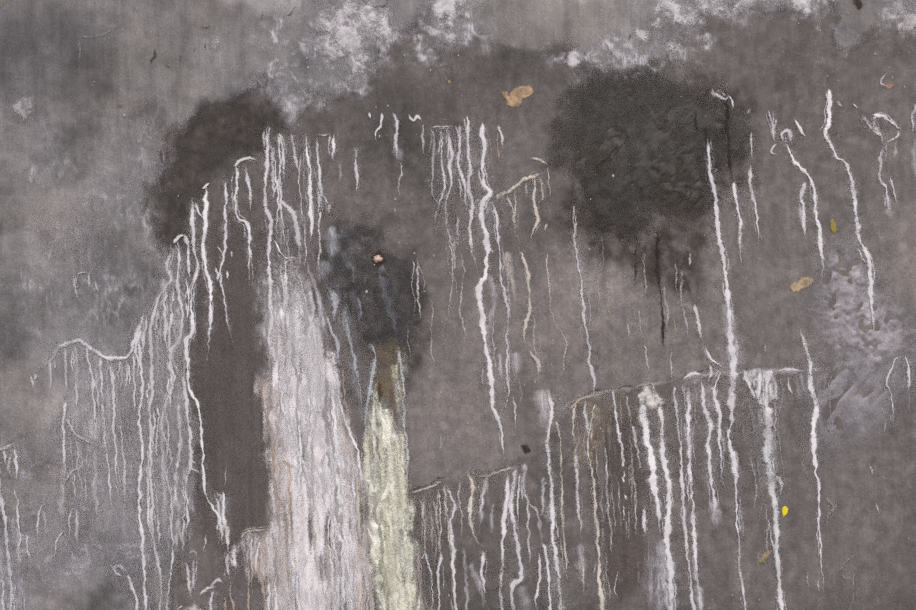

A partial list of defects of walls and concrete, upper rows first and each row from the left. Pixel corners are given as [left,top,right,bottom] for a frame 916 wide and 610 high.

water stain [264,15,289,44]
water stain [13,98,33,121]
water stain [281,94,300,120]
water stain [73,251,136,328]
water stain [53,402,97,470]
water stain [91,365,137,506]
water stain [0,440,92,610]